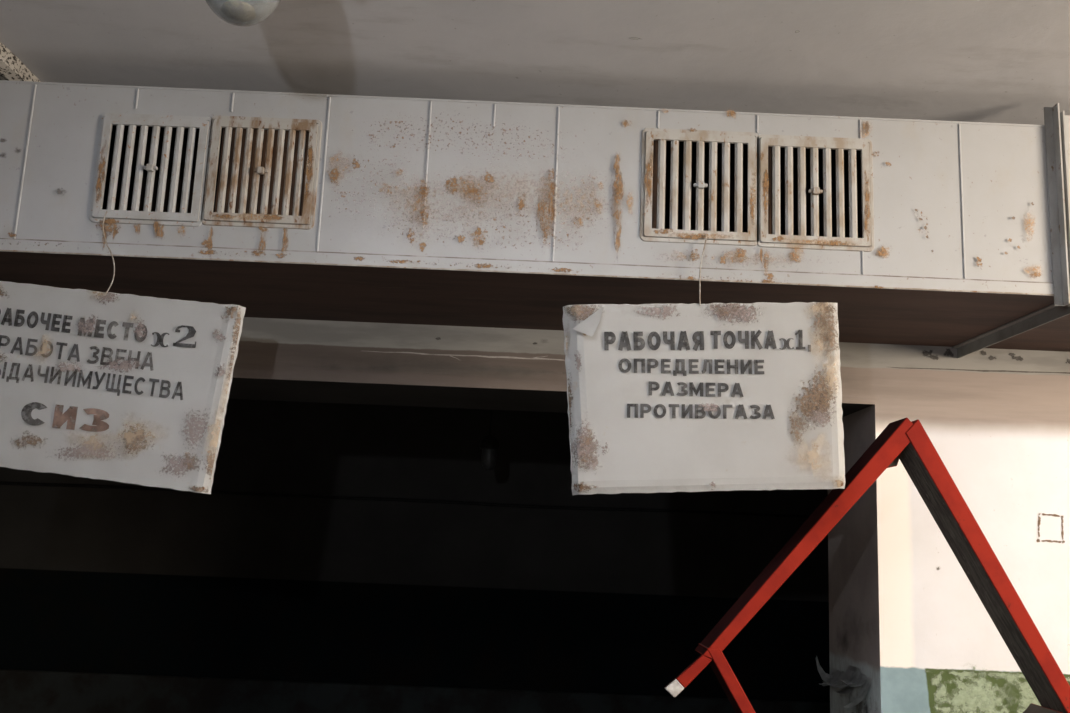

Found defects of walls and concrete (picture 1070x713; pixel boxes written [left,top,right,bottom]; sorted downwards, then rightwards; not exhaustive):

corrosion [328,113,633,269]
corrosion [645,155,653,205]
corrosion [750,170,769,220]
corrosion [96,218,120,248]
corrosion [153,221,164,237]
corrosion [199,213,288,258]
corrosion [654,229,725,261]
corrosion [679,236,784,283]
corrosion [791,240,847,262]
peeling [927,667,1041,713]